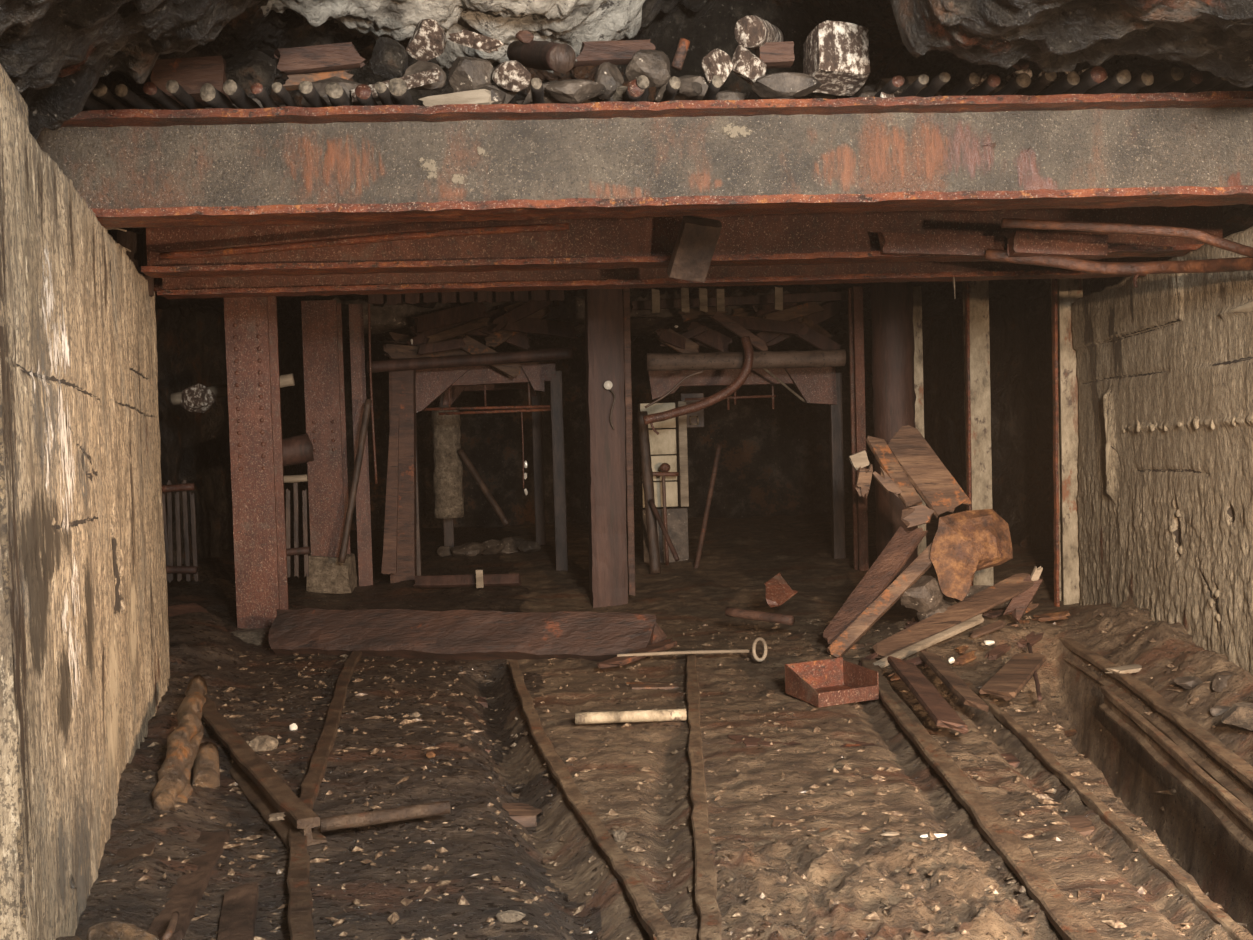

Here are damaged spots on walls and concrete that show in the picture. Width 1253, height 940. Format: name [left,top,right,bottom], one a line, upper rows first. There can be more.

crack [13,364,154,417]